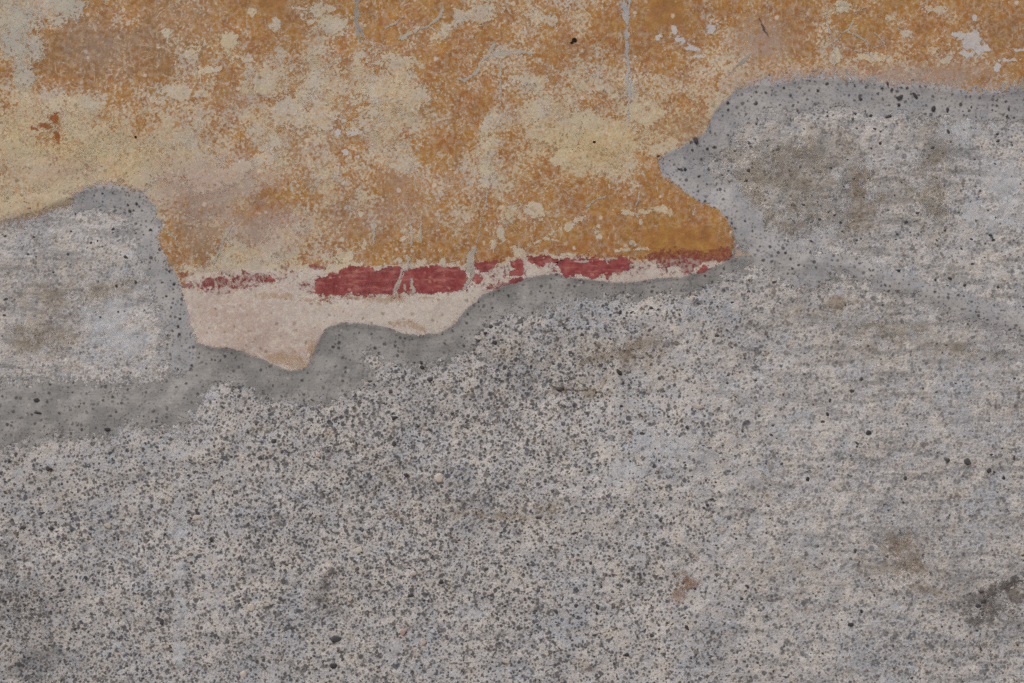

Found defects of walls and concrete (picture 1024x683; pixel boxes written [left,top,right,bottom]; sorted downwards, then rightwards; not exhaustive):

spalling [0,0,448,414]
peeling [472,72,683,192]
crack [619,0,632,122]
spalling [695,95,1024,317]
spalling [0,192,1024,683]